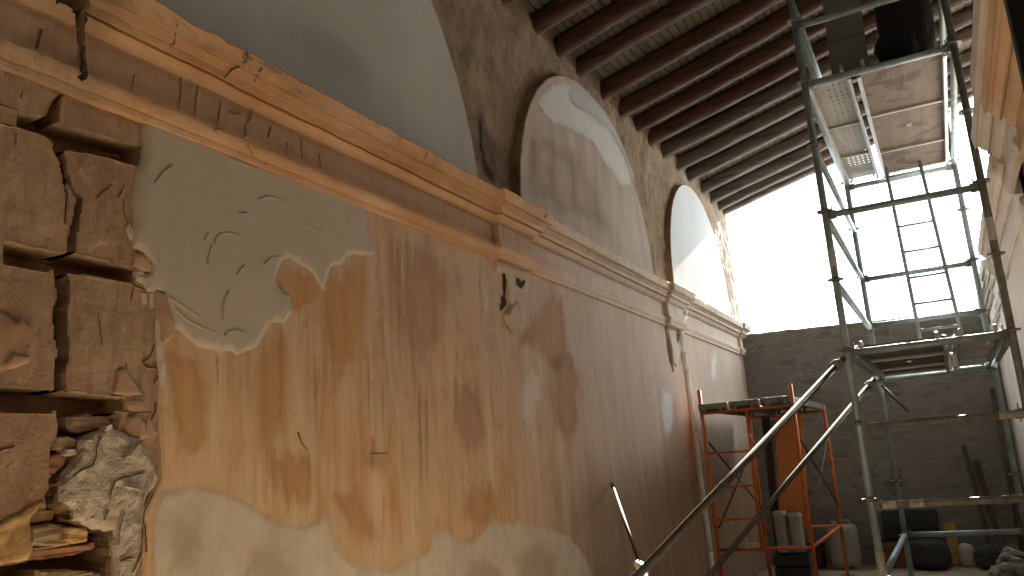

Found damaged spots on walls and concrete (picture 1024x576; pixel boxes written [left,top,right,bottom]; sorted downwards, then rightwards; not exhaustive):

crack [172,52,321,170]
crack [0,0,128,393]
spalling [0,311,36,371]
flaking render [132,253,174,390]
spalling [0,367,158,576]